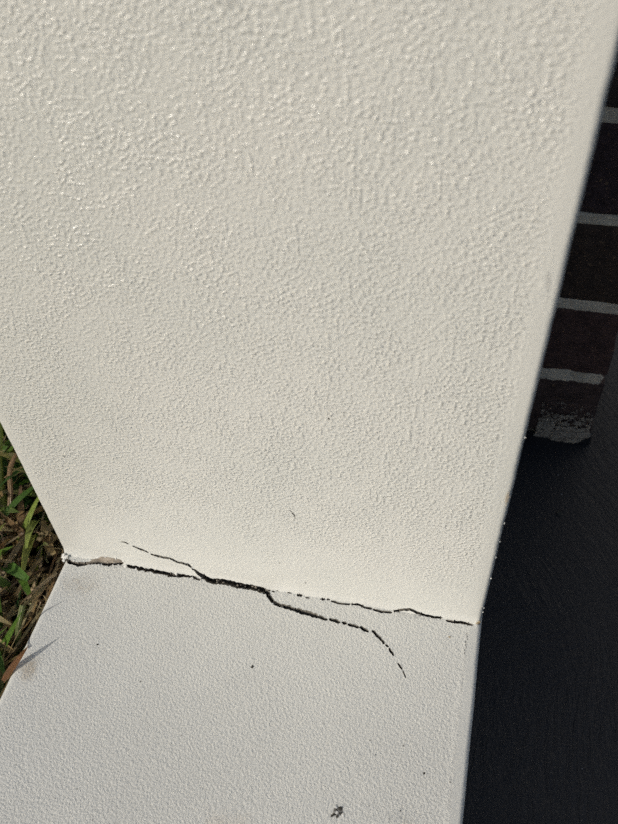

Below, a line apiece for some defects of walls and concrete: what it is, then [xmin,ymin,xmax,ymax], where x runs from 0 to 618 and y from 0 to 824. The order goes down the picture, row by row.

crack [68,542,473,678]